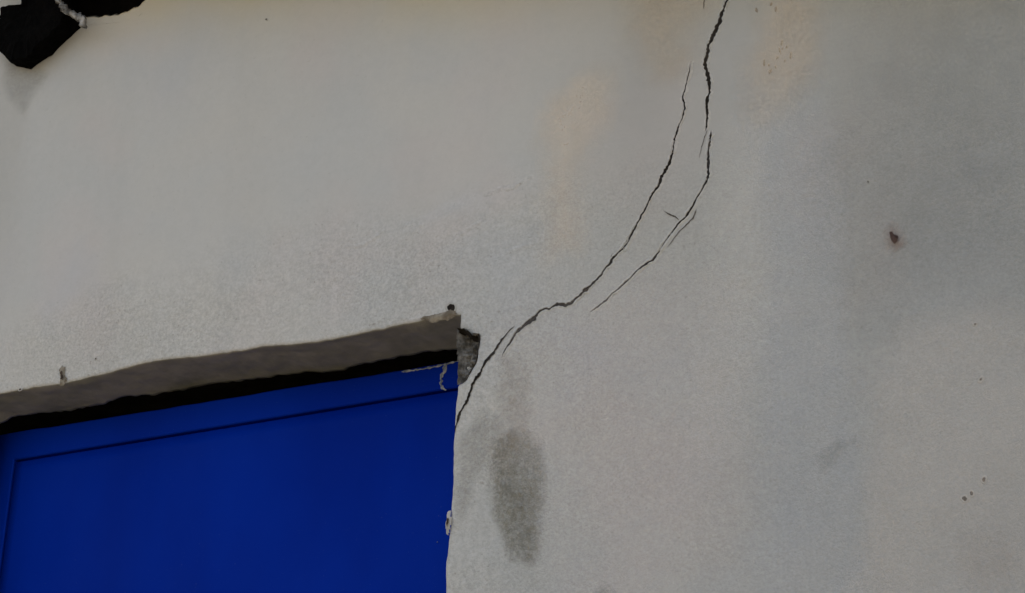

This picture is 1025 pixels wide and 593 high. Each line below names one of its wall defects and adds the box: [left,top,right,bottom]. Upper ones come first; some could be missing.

crack [455,0,731,429]
spalling [420,302,480,385]
water stain [493,435,538,556]